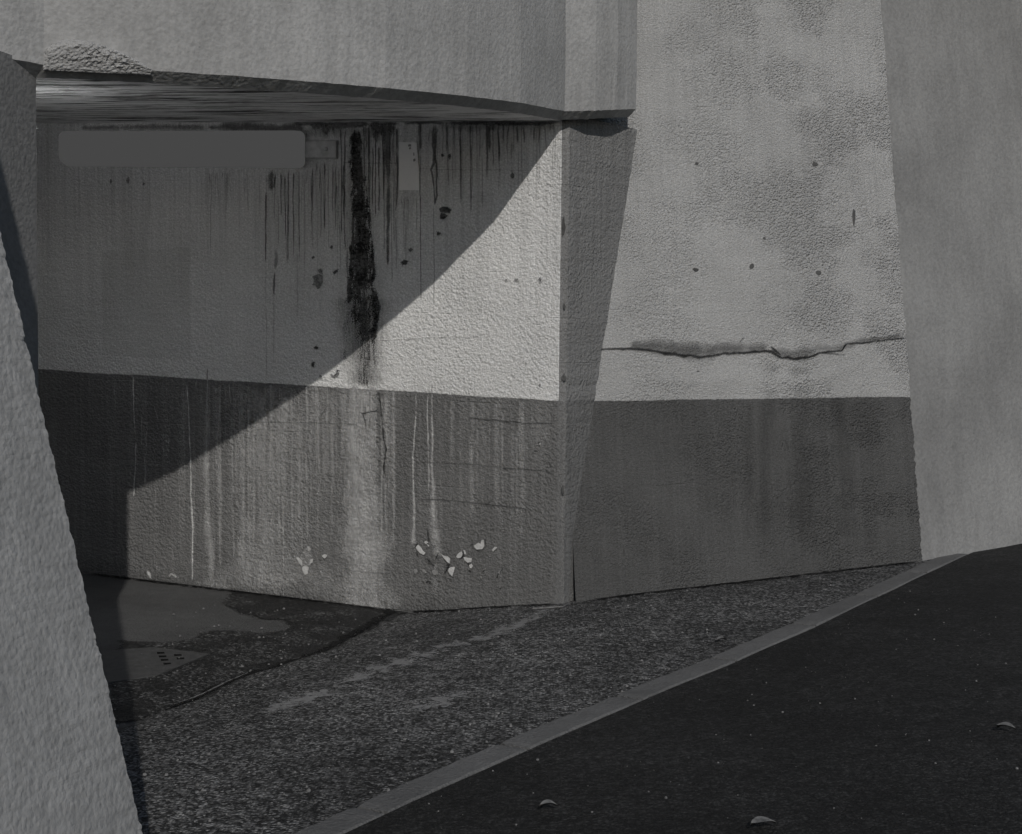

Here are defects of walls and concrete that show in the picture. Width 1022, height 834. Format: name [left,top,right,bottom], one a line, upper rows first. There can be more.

crack [602,337,904,360]
leakage [108,121,556,722]
peeling [296,544,328,575]
peeling [414,530,498,584]